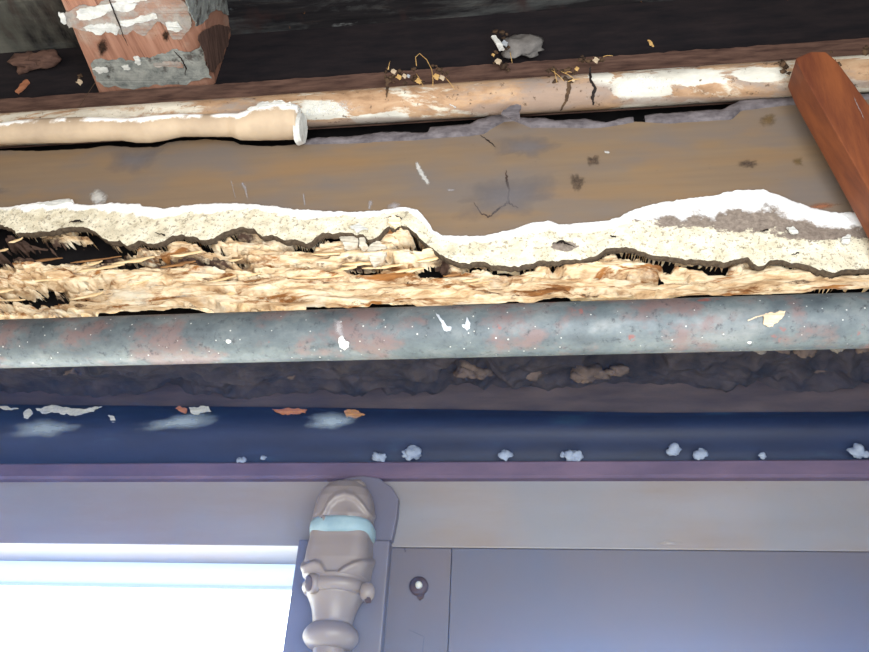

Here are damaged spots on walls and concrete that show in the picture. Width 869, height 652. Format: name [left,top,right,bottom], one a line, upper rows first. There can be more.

crack [109,0,127,43]
peeling [58,0,230,90]
crack [589,67,597,105]
crack [474,171,518,218]
spalling [0,189,869,279]
spalling [0,348,869,423]